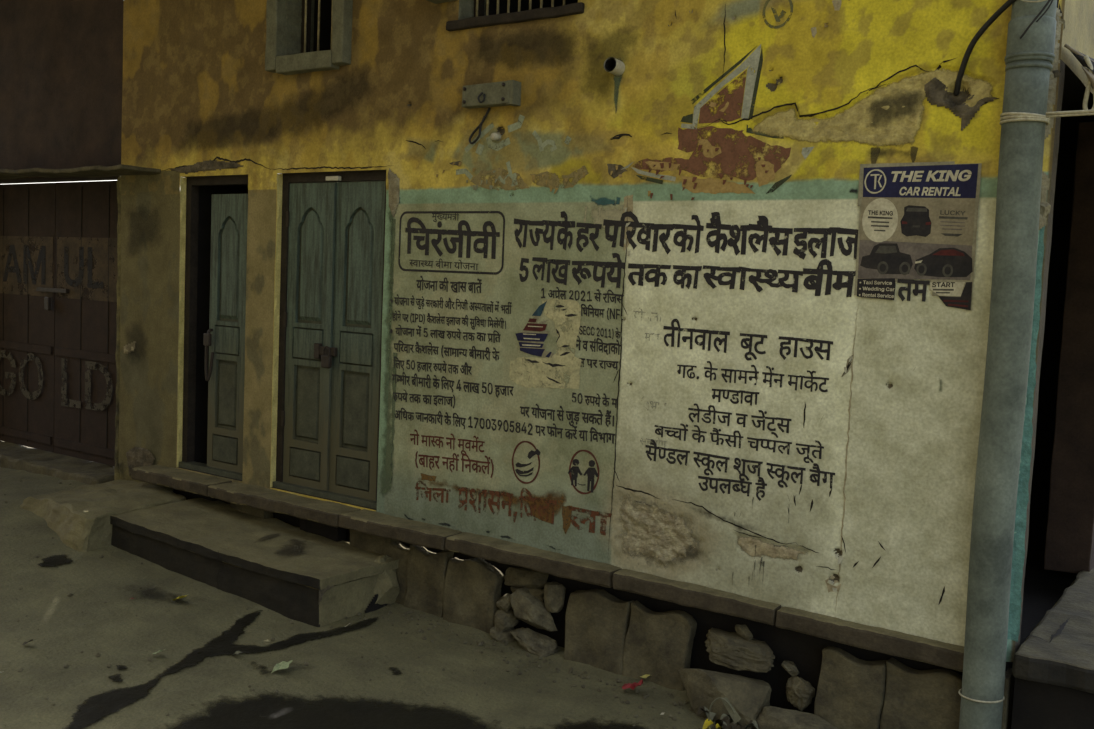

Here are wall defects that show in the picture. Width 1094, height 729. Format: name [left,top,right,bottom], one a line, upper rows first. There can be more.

spalling [752,68,997,147]
peeling [436,161,589,196]
peeling [697,139,721,158]
peeling [645,157,775,200]
crack [608,201,858,611]
spalling [619,496,697,567]